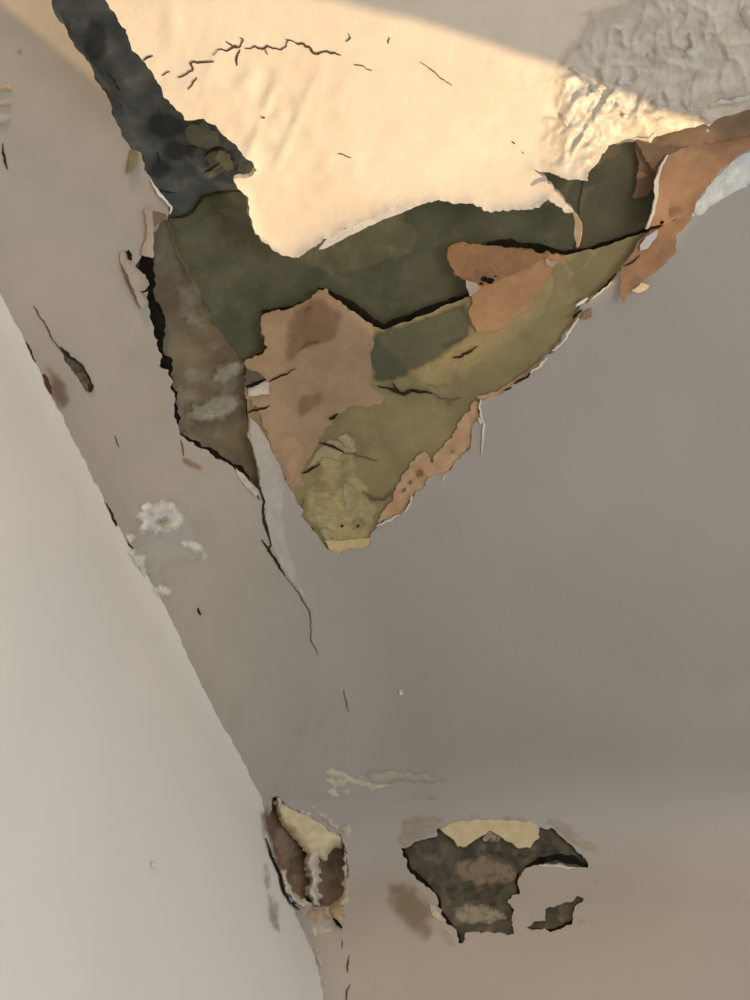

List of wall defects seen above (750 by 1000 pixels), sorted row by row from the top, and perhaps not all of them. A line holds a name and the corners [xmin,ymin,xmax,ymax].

crack [143,35,372,90]
flaking render [692,152,750,216]
peeling [52,0,662,606]
efflorescence [126,500,183,574]
efflorescence [181,541,204,556]
crack [248,480,318,654]
peeling [325,768,438,797]
spalling [265,796,352,936]
spalling [400,815,597,944]